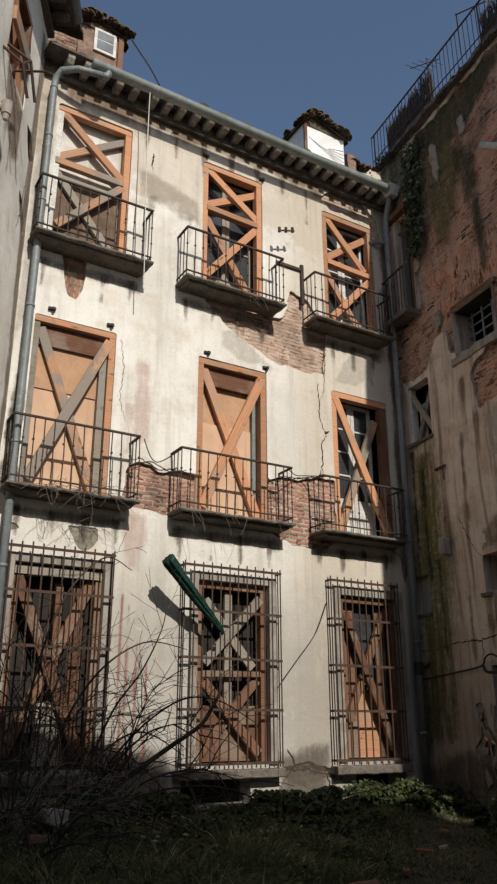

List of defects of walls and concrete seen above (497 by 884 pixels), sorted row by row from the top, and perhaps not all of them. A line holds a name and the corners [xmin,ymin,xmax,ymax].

flaking render [396,42,497,391]
flaking render [62,255,87,299]
flaking render [205,291,327,374]
crack [279,338,333,479]
flaking render [470,342,497,408]
flaking render [122,462,196,515]
flaking render [268,477,336,549]
crack [423,634,497,659]
flaking render [475,703,497,788]